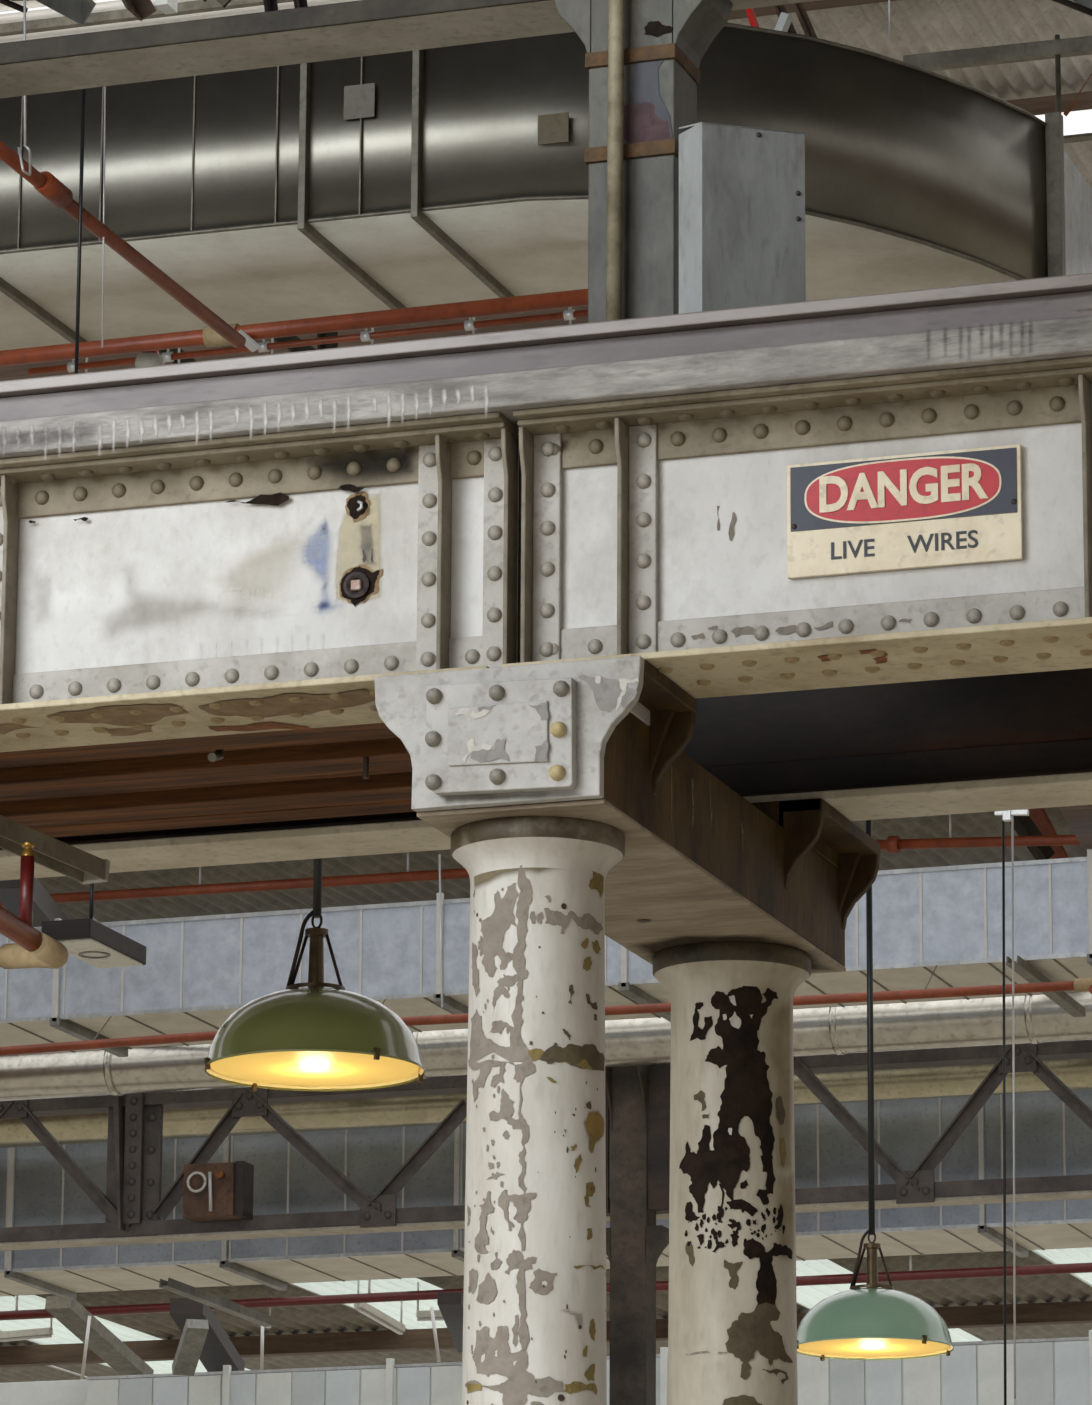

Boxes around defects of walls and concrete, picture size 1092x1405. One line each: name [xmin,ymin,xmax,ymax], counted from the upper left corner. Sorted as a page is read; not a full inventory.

peeling [463,739,509,762]
peeling [577,674,639,713]
peeling [465,865,606,1405]
peeling [679,986,793,1405]